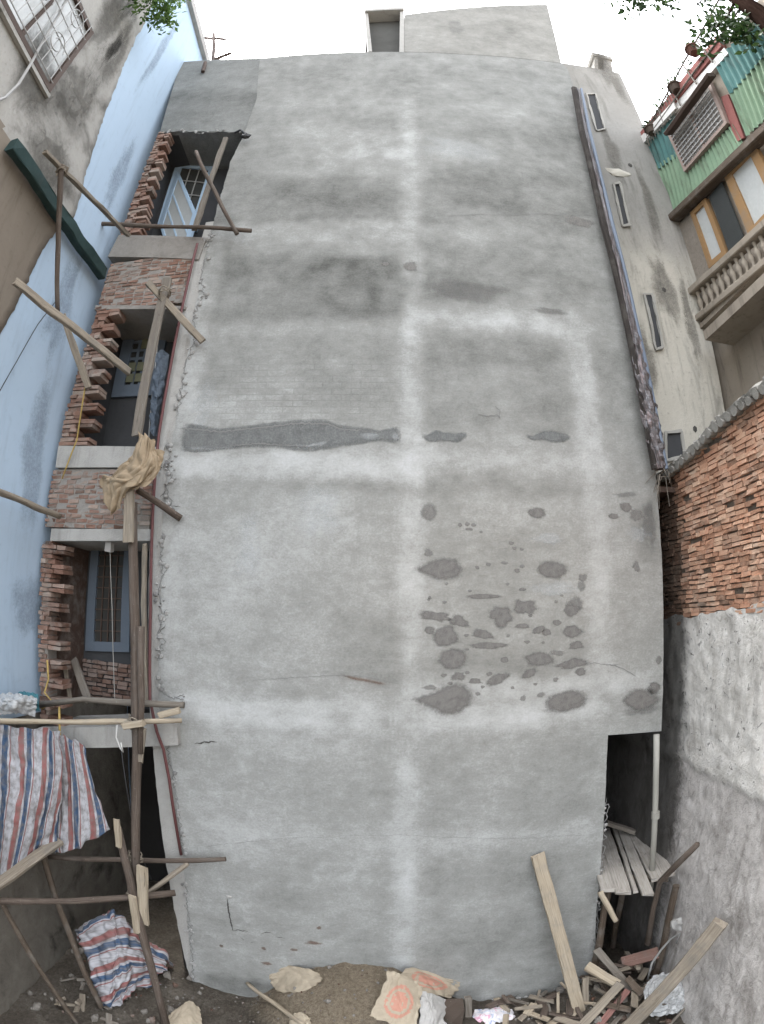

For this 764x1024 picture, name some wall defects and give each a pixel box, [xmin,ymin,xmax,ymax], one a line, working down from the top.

water stain [181,420,399,452]
water stain [424,431,466,442]
water stain [528,431,569,442]
water stain [422,505,436,520]
water stain [528,508,545,518]
water stain [609,493,653,533]
water stain [418,549,462,585]
water stain [538,561,566,578]
water stain [416,574,587,714]
water stain [623,682,660,712]